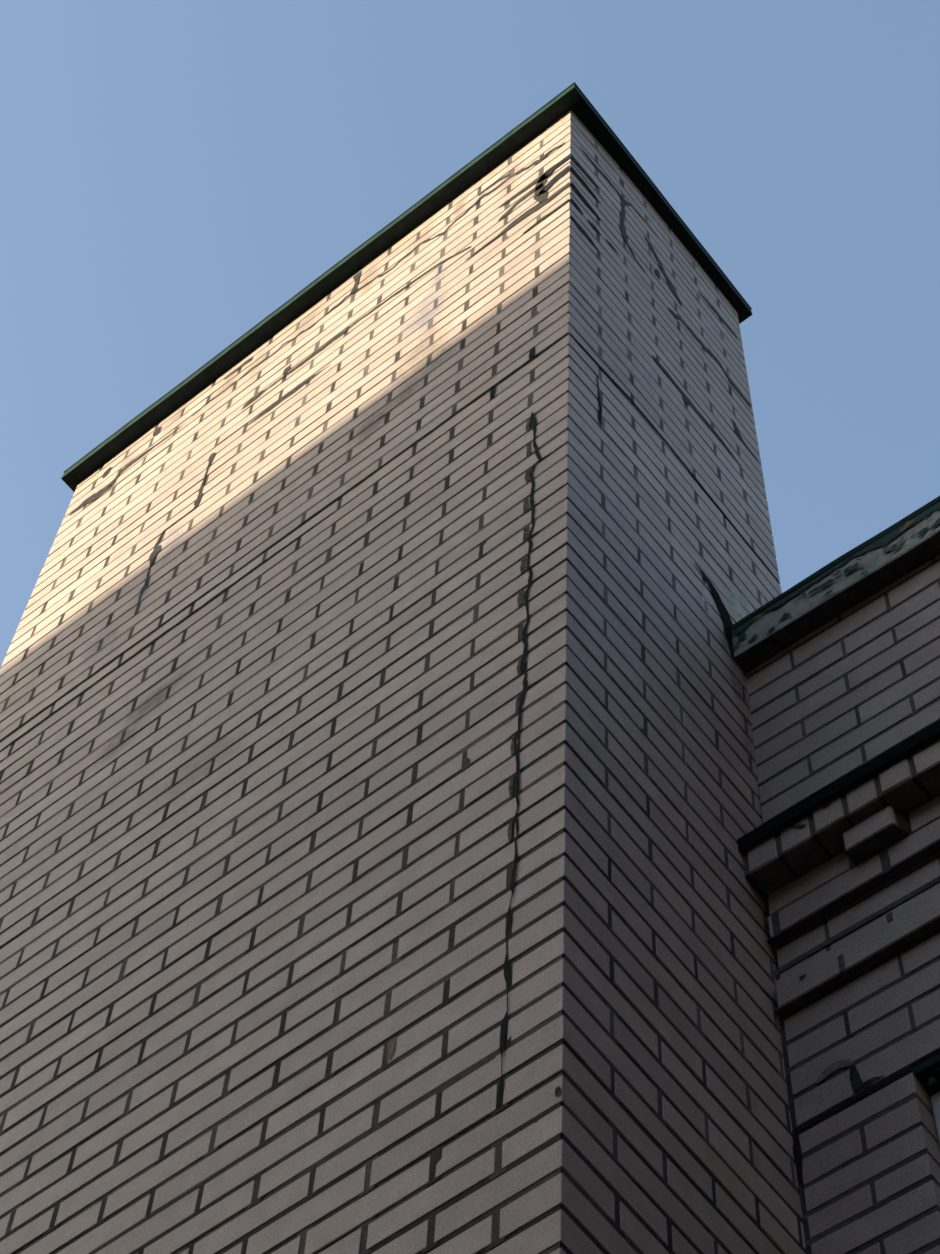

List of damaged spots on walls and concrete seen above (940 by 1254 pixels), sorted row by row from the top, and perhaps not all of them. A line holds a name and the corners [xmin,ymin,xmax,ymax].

crack [193,142,656,415]
crack [138,452,216,604]
peeling [731,502,940,649]
crack [496,412,550,1108]